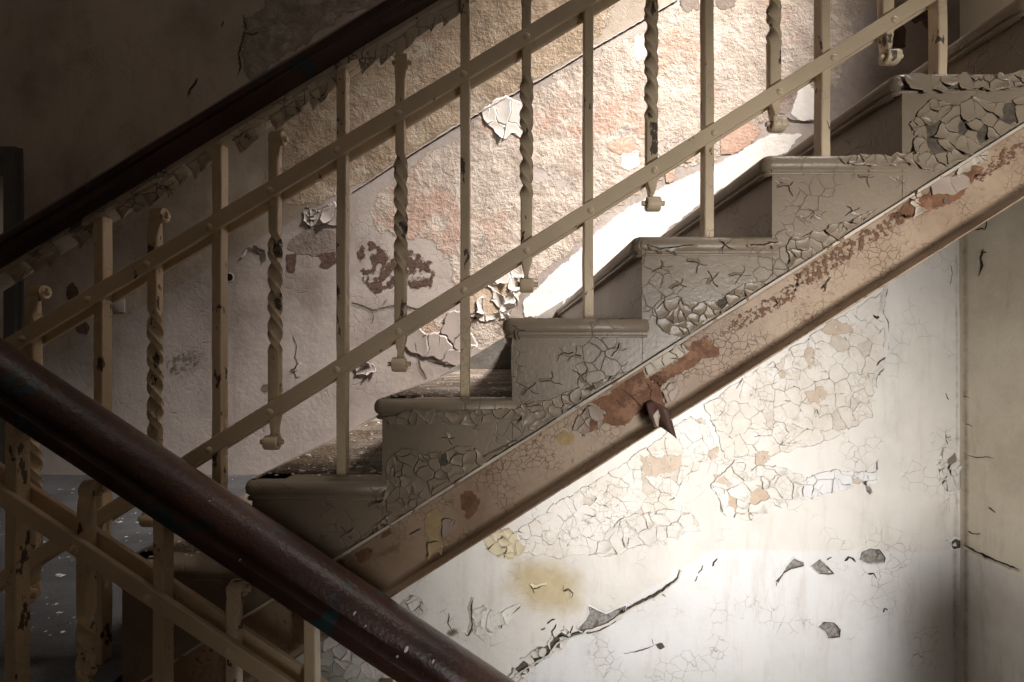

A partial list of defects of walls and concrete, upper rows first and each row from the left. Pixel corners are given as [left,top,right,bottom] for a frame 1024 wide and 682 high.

flaking render [269,0,569,173]
flaking render [350,0,700,293]
flaking render [714,0,814,122]
peeling [714,82,814,194]
peeling [405,153,700,367]
crack [648,239,782,289]
rust [728,140,1024,330]
crack [947,221,987,286]
peeling [483,282,885,560]
crack [498,582,573,629]
crack [512,558,718,680]
crack [963,531,1018,571]